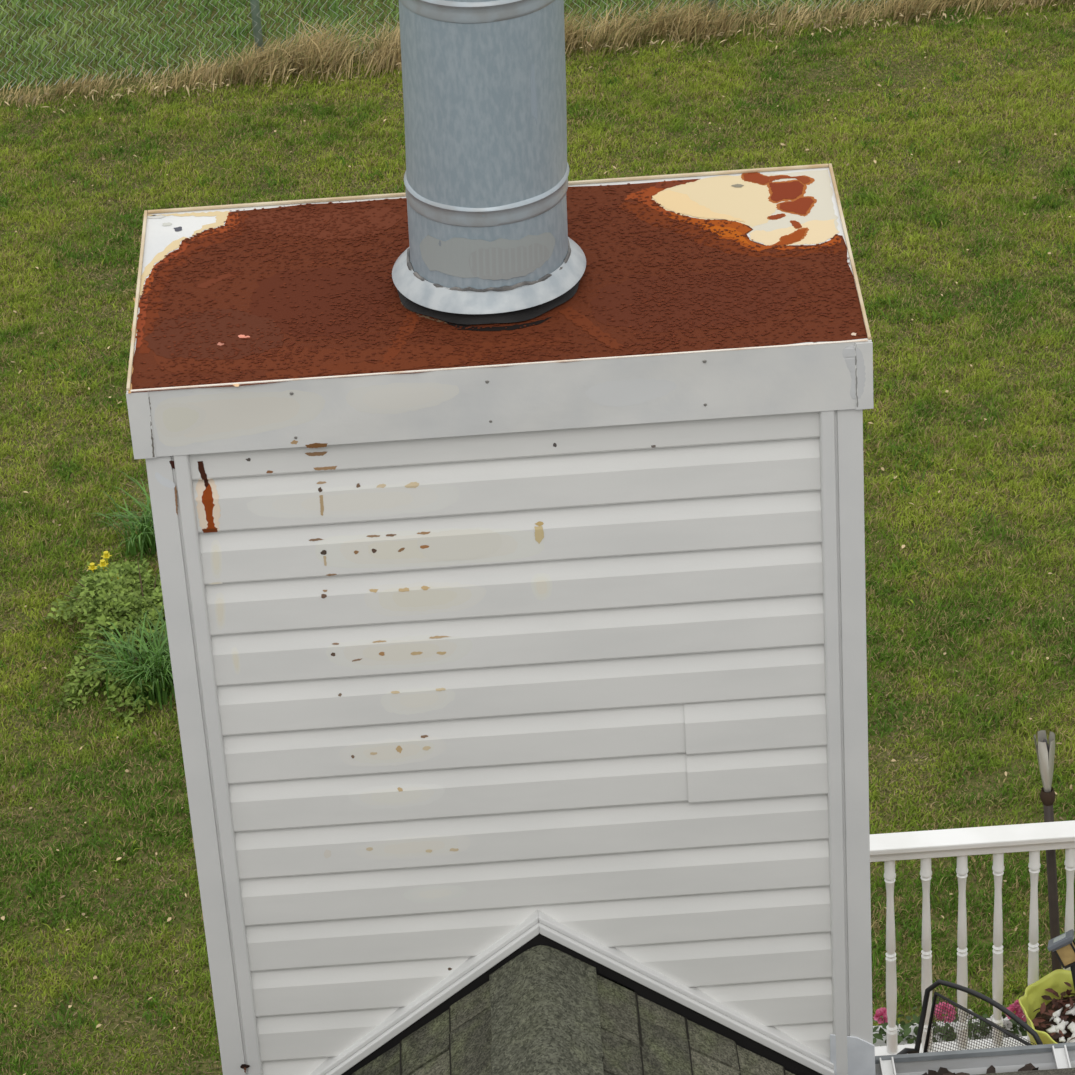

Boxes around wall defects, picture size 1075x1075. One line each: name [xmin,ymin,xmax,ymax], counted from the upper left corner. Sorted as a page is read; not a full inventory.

corrosion [131,172,868,393]
corrosion [196,461,221,533]
corrosion [291,440,337,516]
corrosion [534,521,544,544]